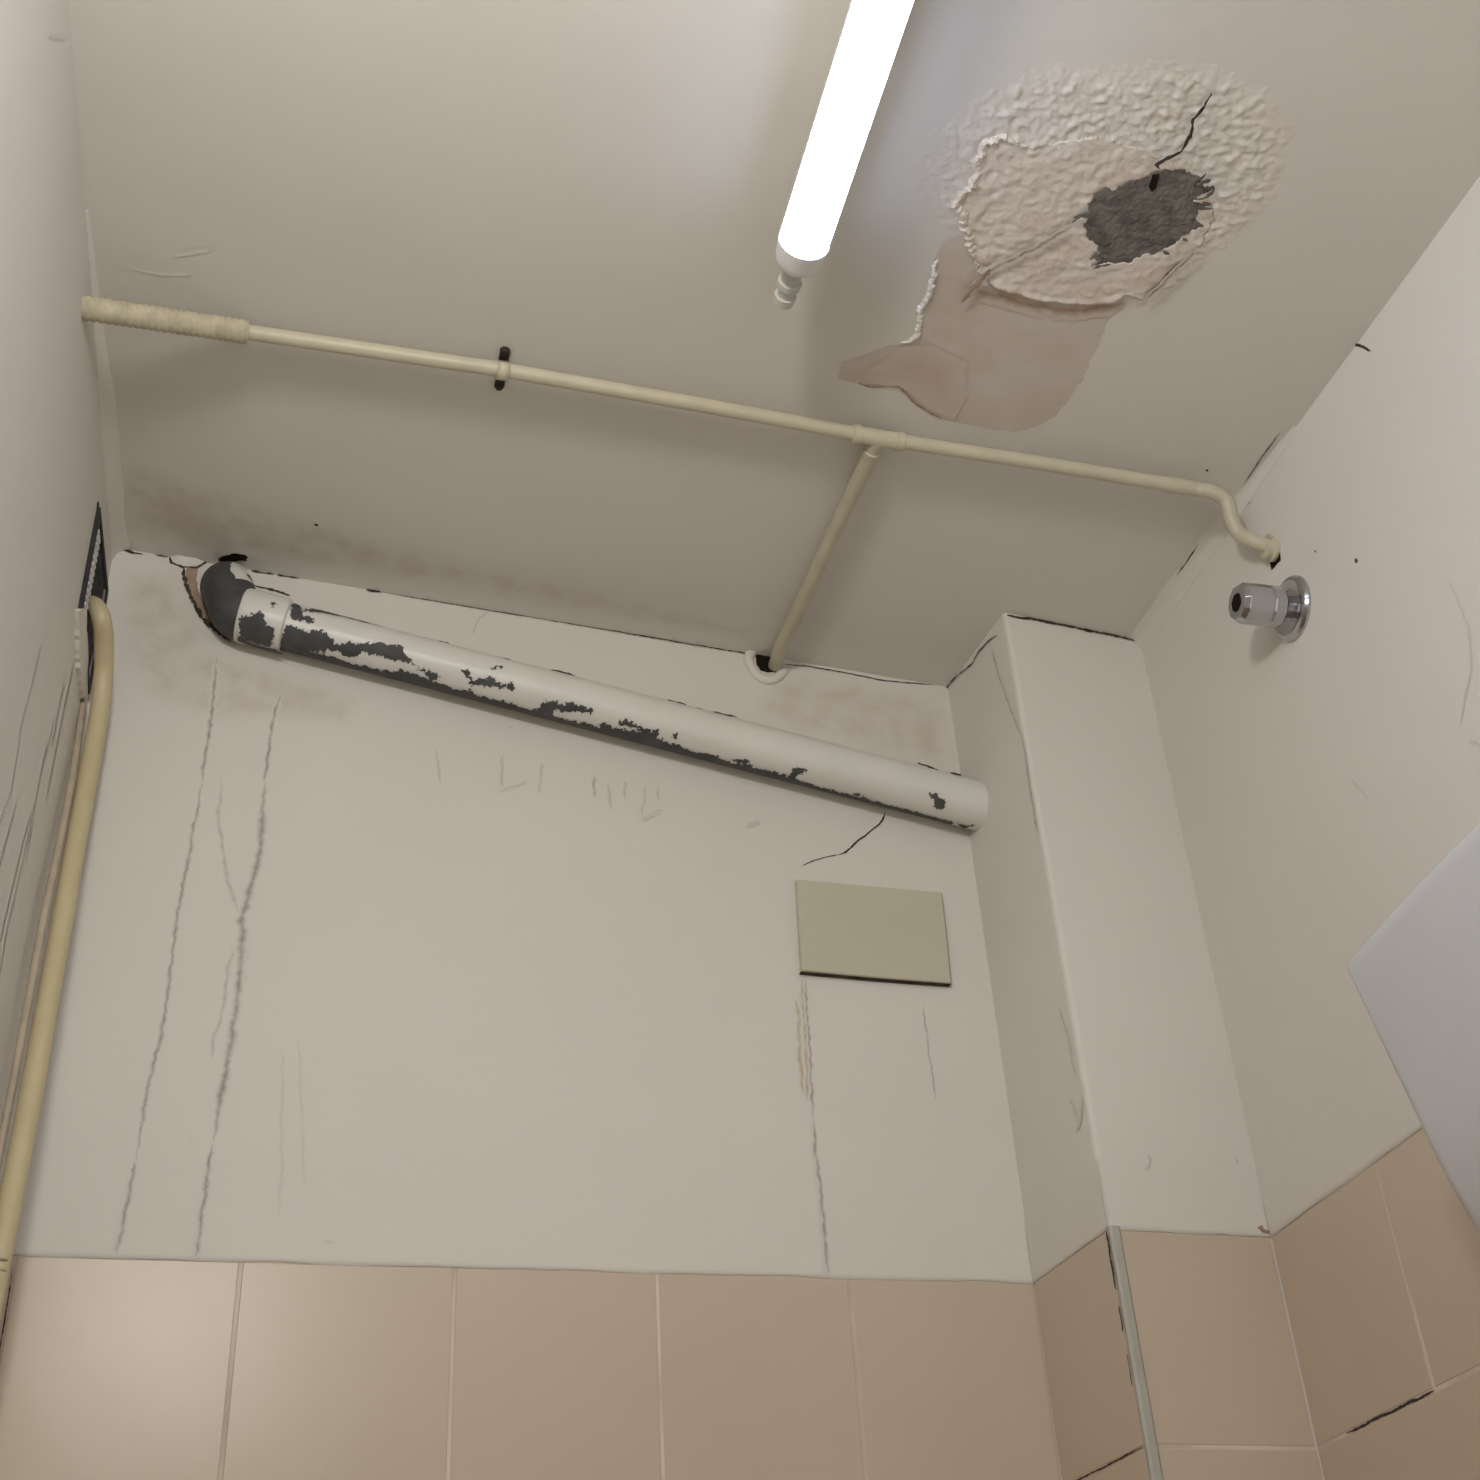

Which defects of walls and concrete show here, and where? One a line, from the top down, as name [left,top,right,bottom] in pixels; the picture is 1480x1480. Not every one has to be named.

flaking render [838,58,1296,432]
peeling [169,553,973,828]
crack [804,814,885,865]